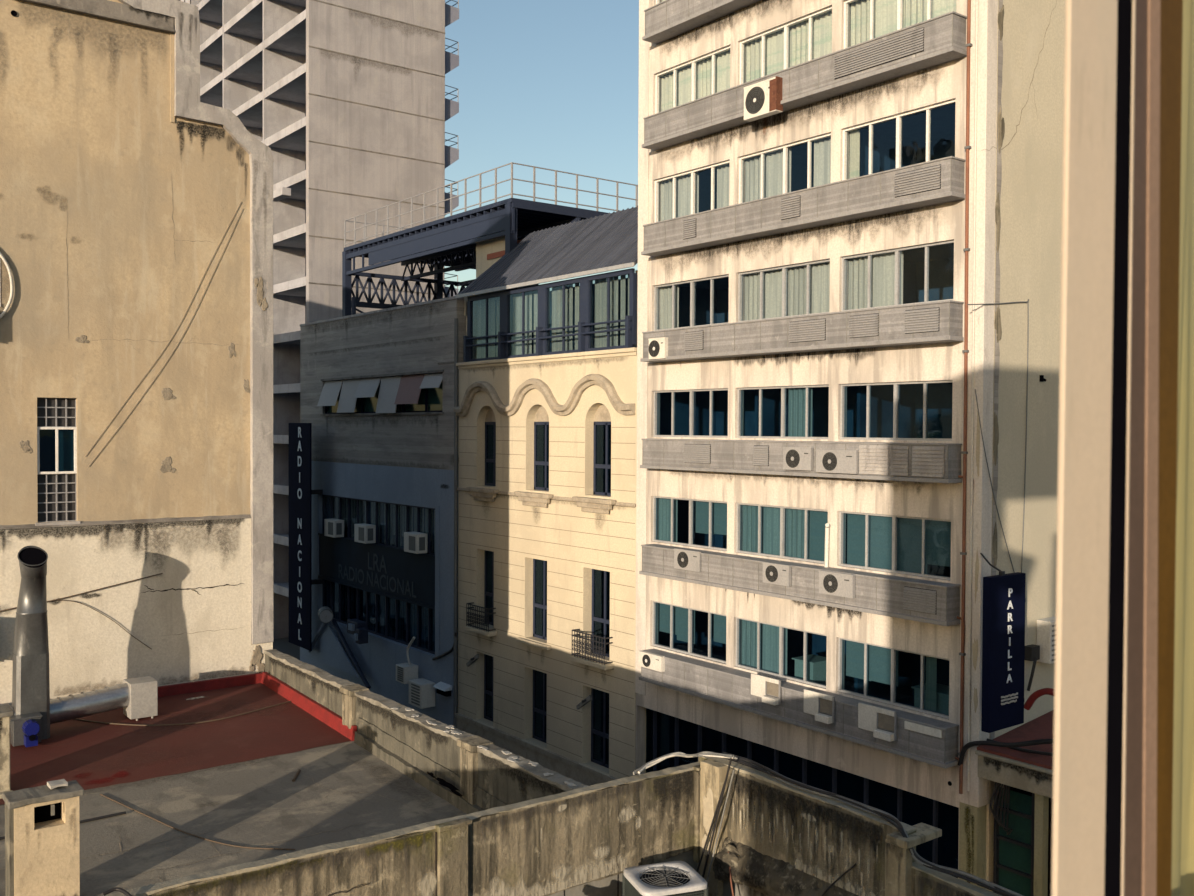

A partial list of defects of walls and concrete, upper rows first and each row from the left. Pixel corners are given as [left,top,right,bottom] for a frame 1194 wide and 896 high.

crack [976,1,1057,151]
water stain [177,122,246,170]
spalling [160,456,176,473]
water stain [0,518,243,549]
crack [143,583,244,595]
water stain [481,754,693,840]
water stain [722,774,895,896]
water stain [419,875,436,896]
water stain [491,847,626,896]